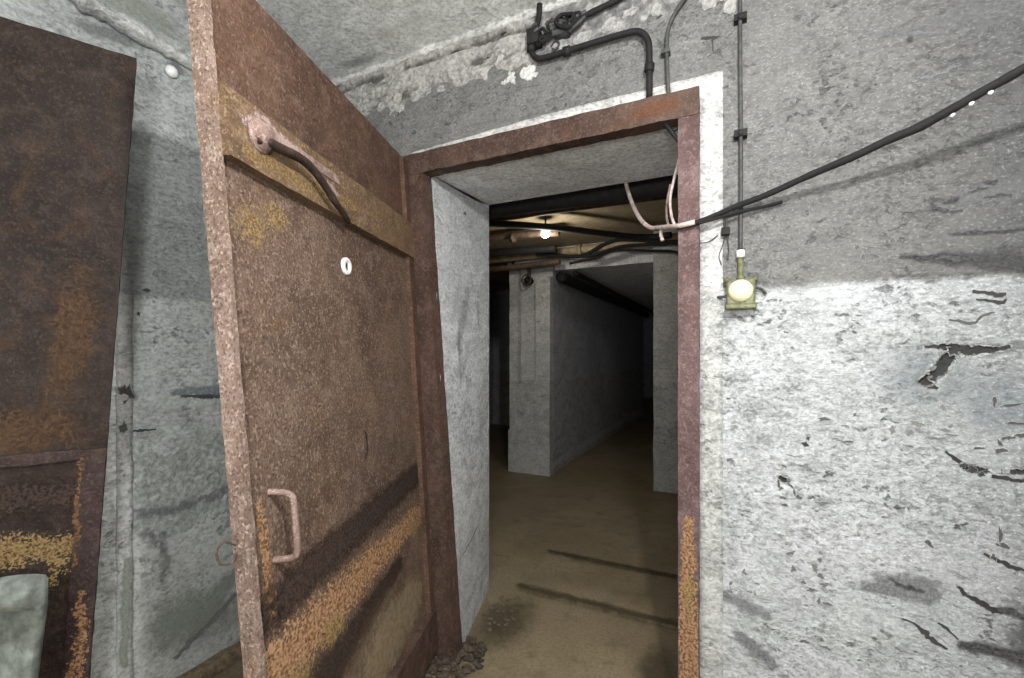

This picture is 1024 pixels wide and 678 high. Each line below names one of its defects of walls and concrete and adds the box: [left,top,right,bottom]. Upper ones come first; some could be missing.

peeling [339,0,736,117]
corrosion [679,515,698,678]